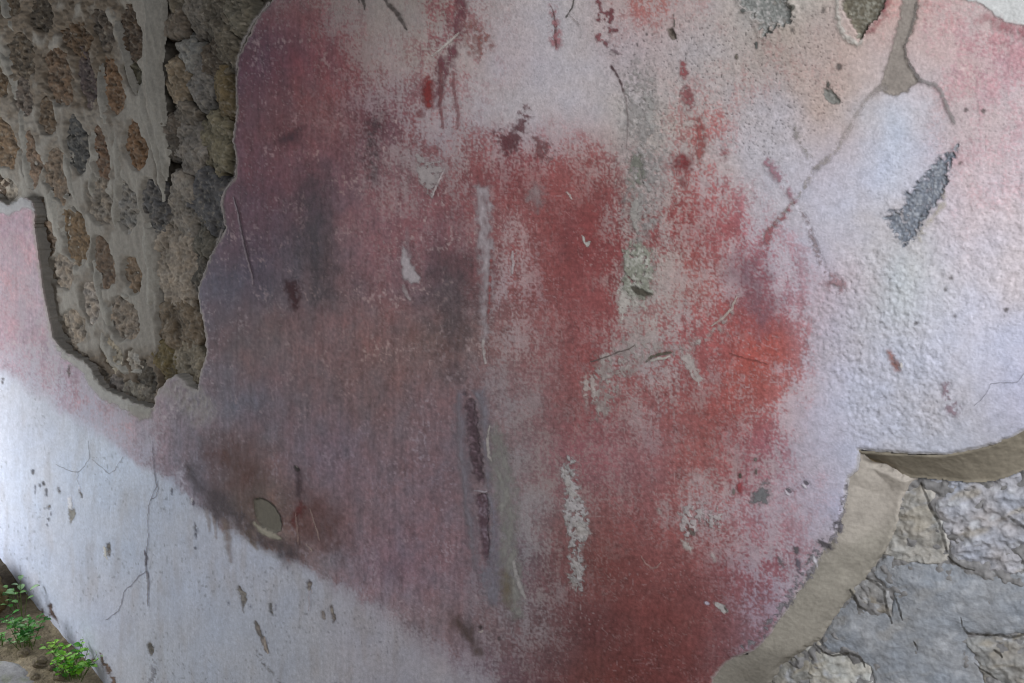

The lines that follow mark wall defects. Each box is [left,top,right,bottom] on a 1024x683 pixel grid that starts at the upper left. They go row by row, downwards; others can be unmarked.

spalling [740,0,795,49]
spalling [822,0,889,46]
spalling [0,0,272,420]
crack [761,0,956,294]
spalling [882,144,961,247]
crack [106,447,159,620]
spalling [713,431,1024,683]